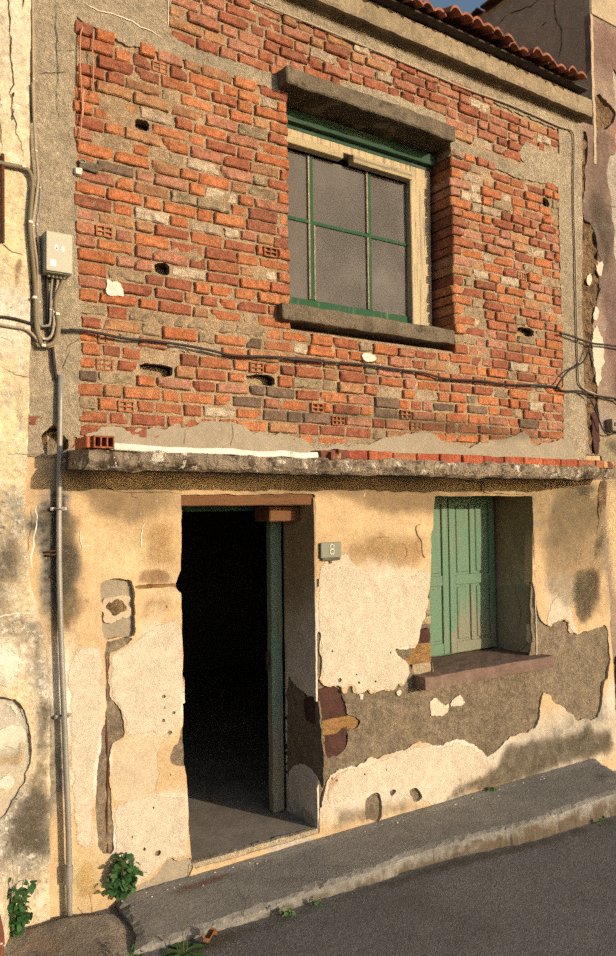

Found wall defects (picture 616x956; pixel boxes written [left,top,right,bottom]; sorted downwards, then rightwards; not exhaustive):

crack [0,0,24,156]
crack [40,6,75,113]
crack [84,0,169,38]
crack [496,0,562,54]
flaking render [595,70,616,259]
flaking render [582,221,605,454]
water stain [576,570,599,620]
flaking render [286,582,609,807]
flaking render [0,698,31,817]
water stain [11,783,48,853]
flaking render [365,789,394,821]
water stain [455,727,613,796]